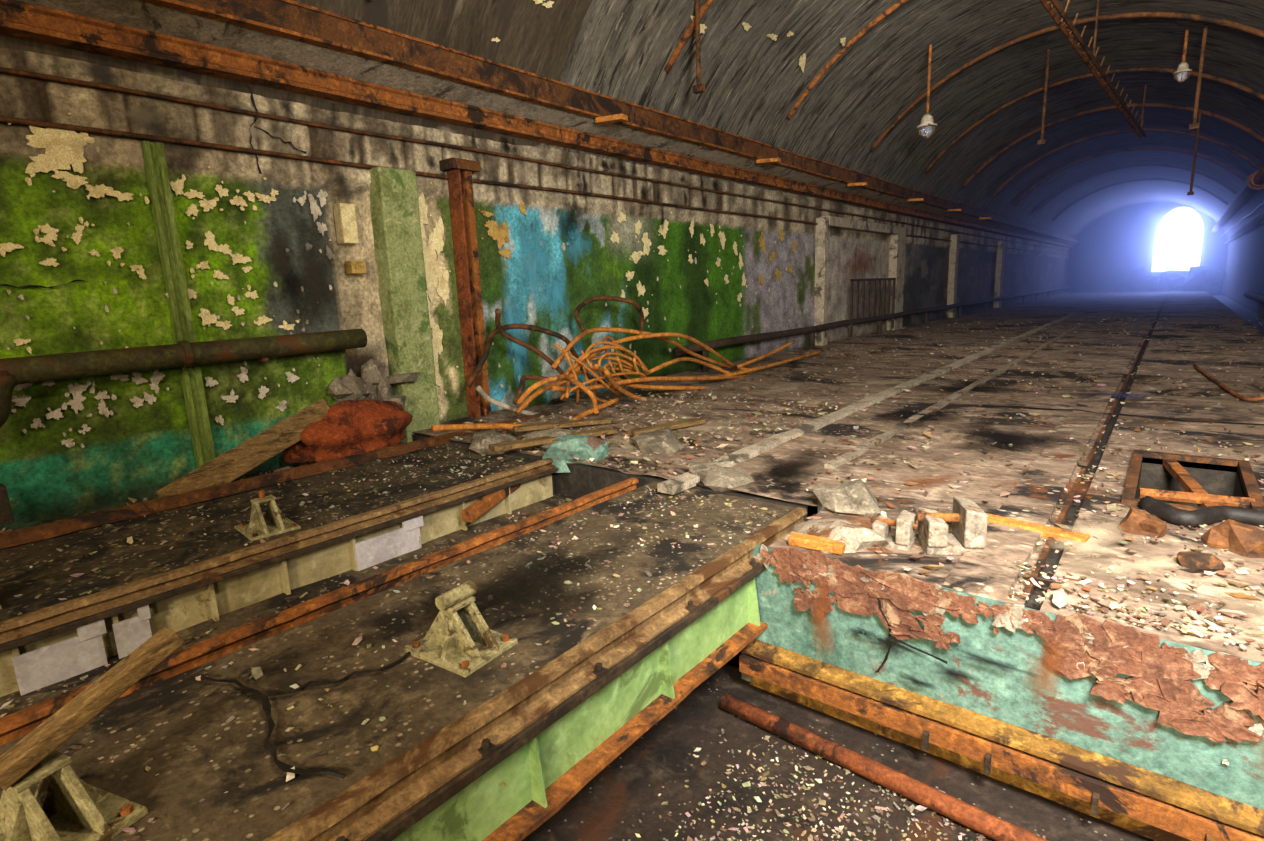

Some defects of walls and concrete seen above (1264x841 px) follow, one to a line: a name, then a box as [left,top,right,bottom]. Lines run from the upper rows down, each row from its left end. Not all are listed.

crack [0,280,84,289]
peeling [0,217,147,279]
peeling [25,113,150,204]
peeling [170,174,279,225]
peeling [185,231,309,334]
damp [272,233,332,319]
damp [337,174,349,199]
damp [563,202,583,256]
damp [577,159,637,192]
damp [506,302,524,384]
peeling [11,369,169,448]
spalling [740,540,1264,810]